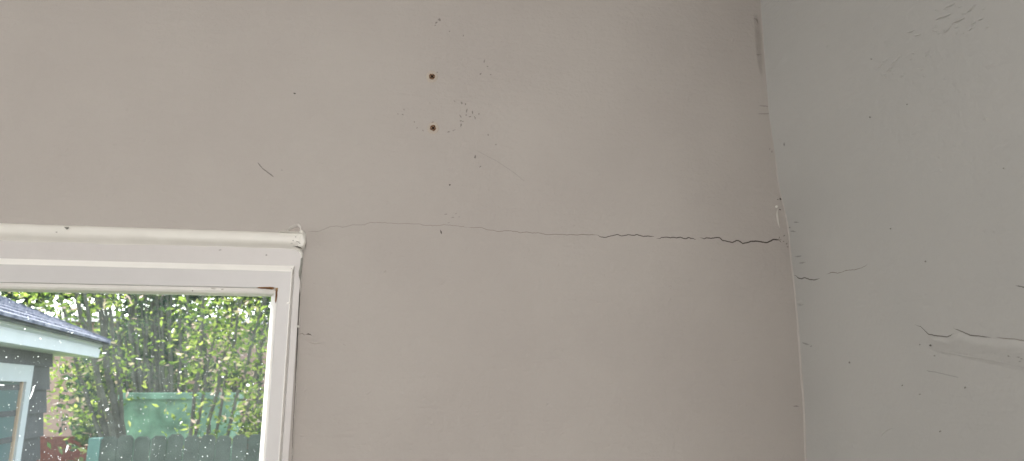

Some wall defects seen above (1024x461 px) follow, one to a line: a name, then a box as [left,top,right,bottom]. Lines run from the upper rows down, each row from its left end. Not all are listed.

crack [291,221,781,461]
crack [916,325,1024,342]